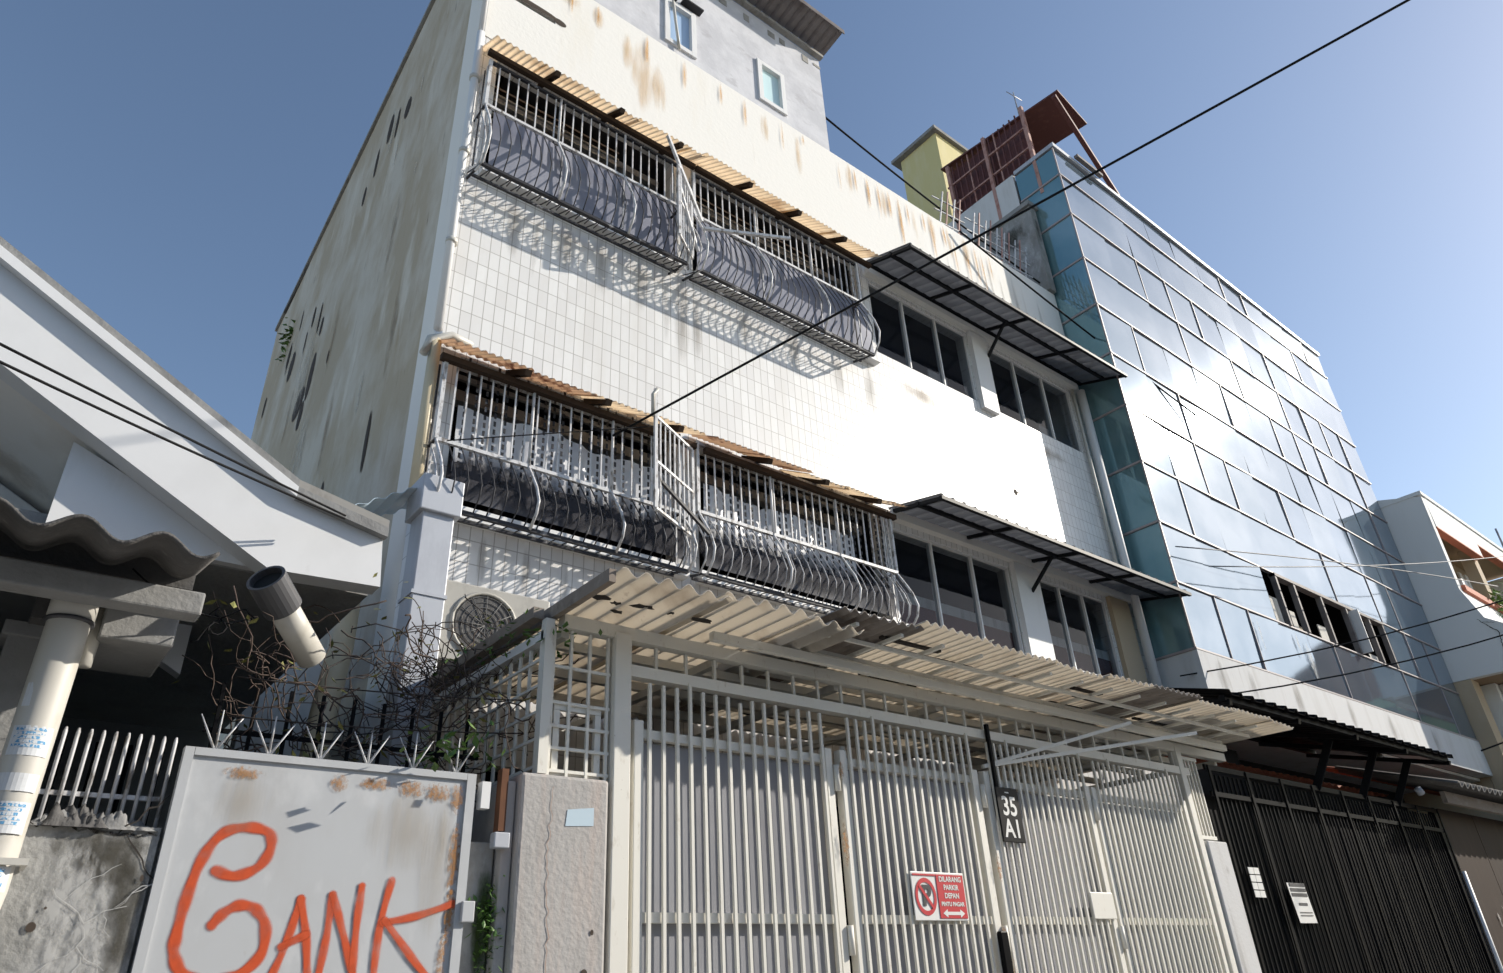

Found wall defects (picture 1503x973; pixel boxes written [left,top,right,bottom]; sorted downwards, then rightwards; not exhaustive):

corrosion [231,766,257,779]
corrosion [332,776,461,809]
leakage [29,836,144,973]
corrosion [437,828,460,973]